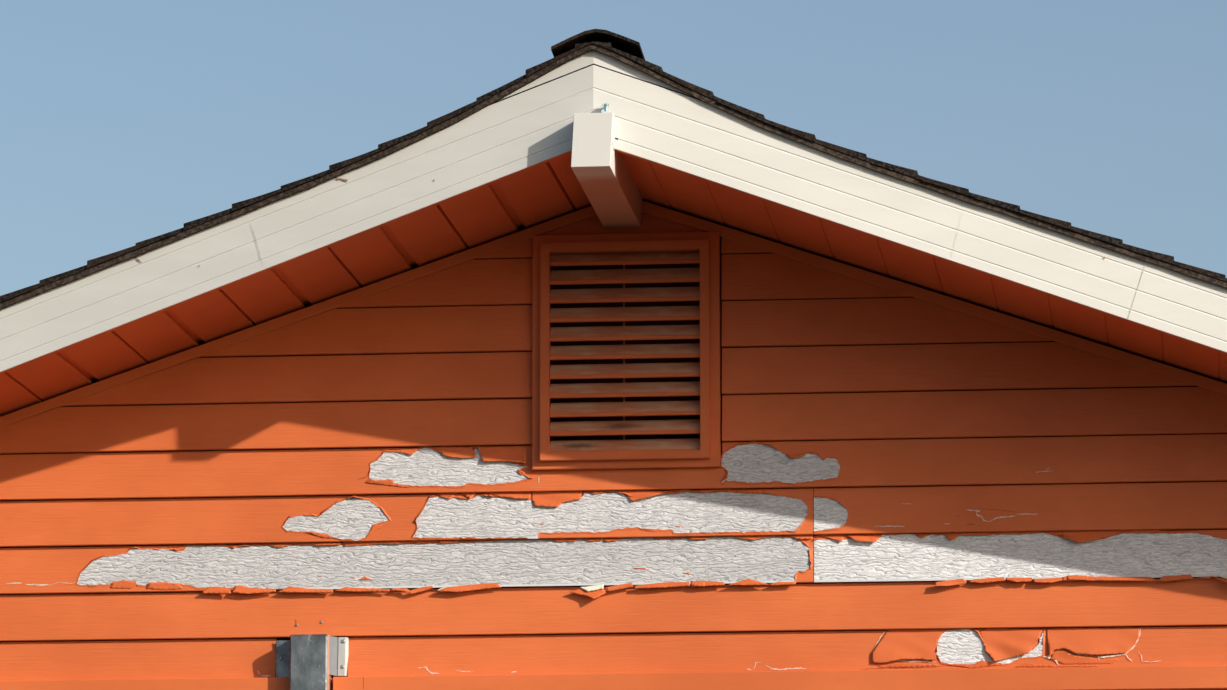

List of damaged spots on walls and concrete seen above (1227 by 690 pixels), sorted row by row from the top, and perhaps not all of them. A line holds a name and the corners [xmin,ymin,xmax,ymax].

peeling [6,441,1227,599]
peeling [872,628,1046,668]